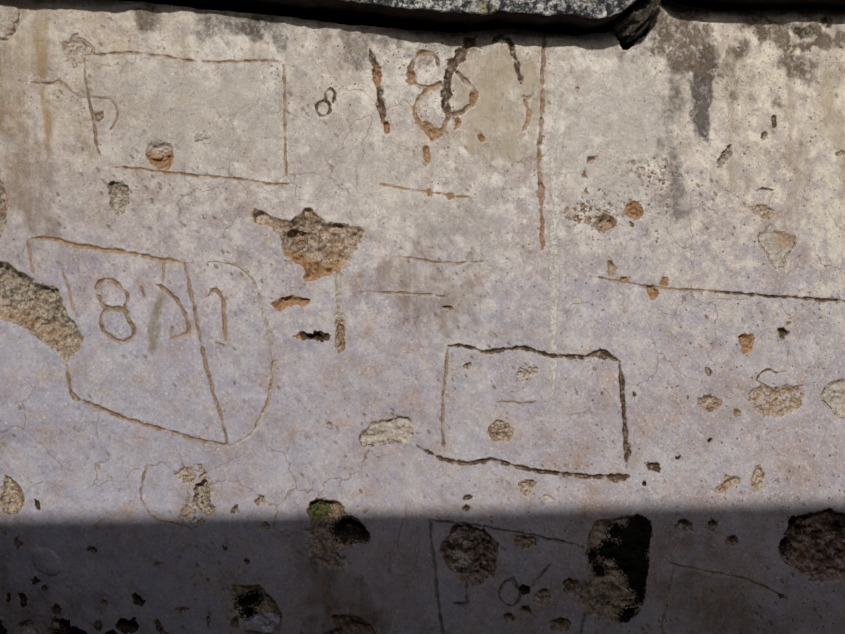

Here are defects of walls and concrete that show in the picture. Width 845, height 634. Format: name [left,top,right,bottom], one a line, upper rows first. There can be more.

damp [726,40,748,64]
damp [742,11,845,79]
damp [549,0,717,399]
spalling [0,254,89,370]
spalling [243,202,372,359]
spalling [733,316,797,360]
spalling [691,362,845,431]
peeling [0,468,48,544]
peeling [159,452,279,539]
spalling [292,492,376,581]
spalling [497,508,658,634]
spalling [773,503,845,597]